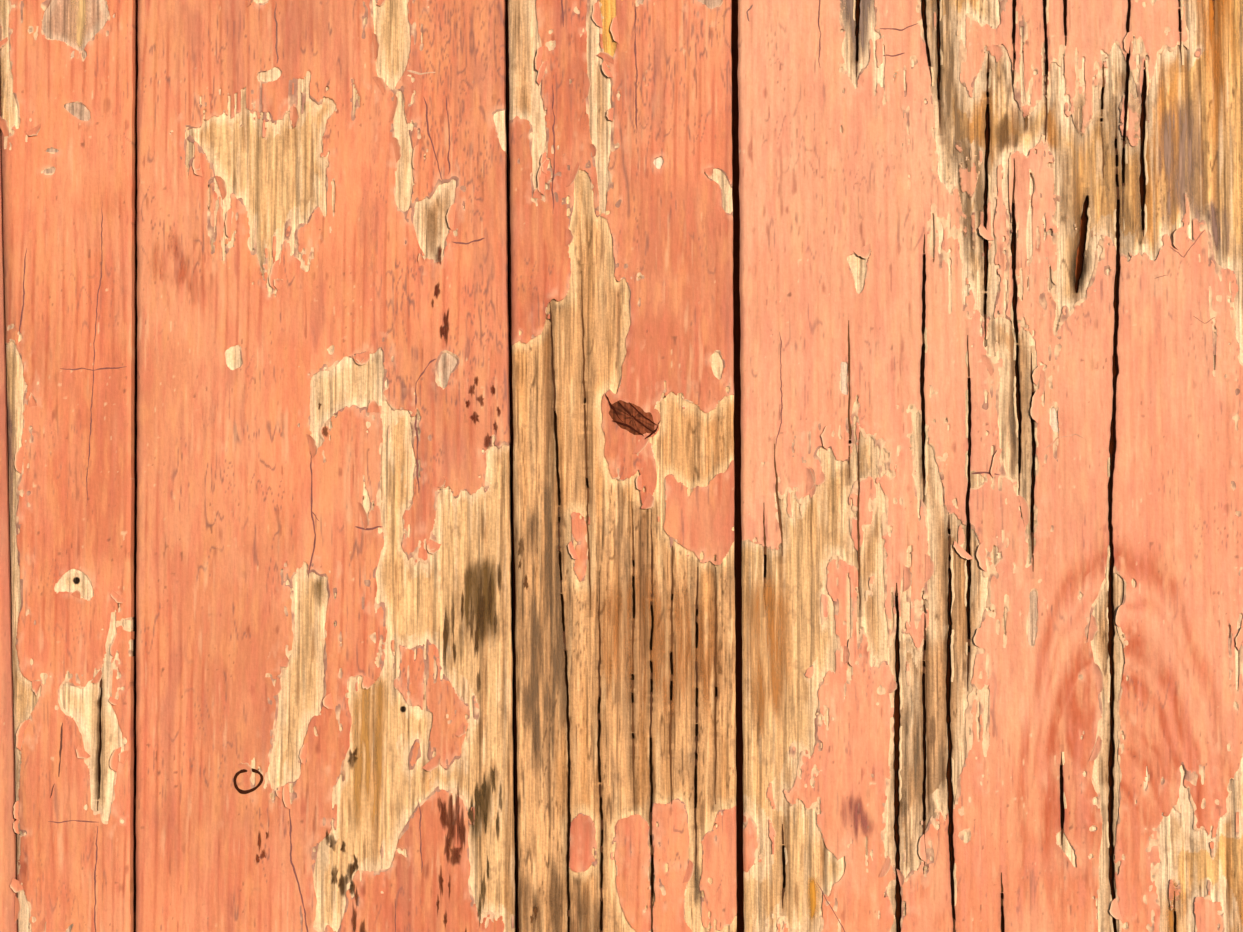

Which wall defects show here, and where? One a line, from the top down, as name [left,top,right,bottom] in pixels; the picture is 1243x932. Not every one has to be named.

peeling [0,0,115,150]
peeling [6,324,133,932]
peeling [169,67,360,298]
peeling [237,0,1010,932]
crack [848,320,861,605]
crack [893,0,1067,932]
peeling [916,0,1243,573]
peeling [1056,566,1165,932]
crack [1075,0,1205,932]
peeling [1143,743,1243,932]
crack [1178,0,1243,65]
peeling [1228,613,1243,710]